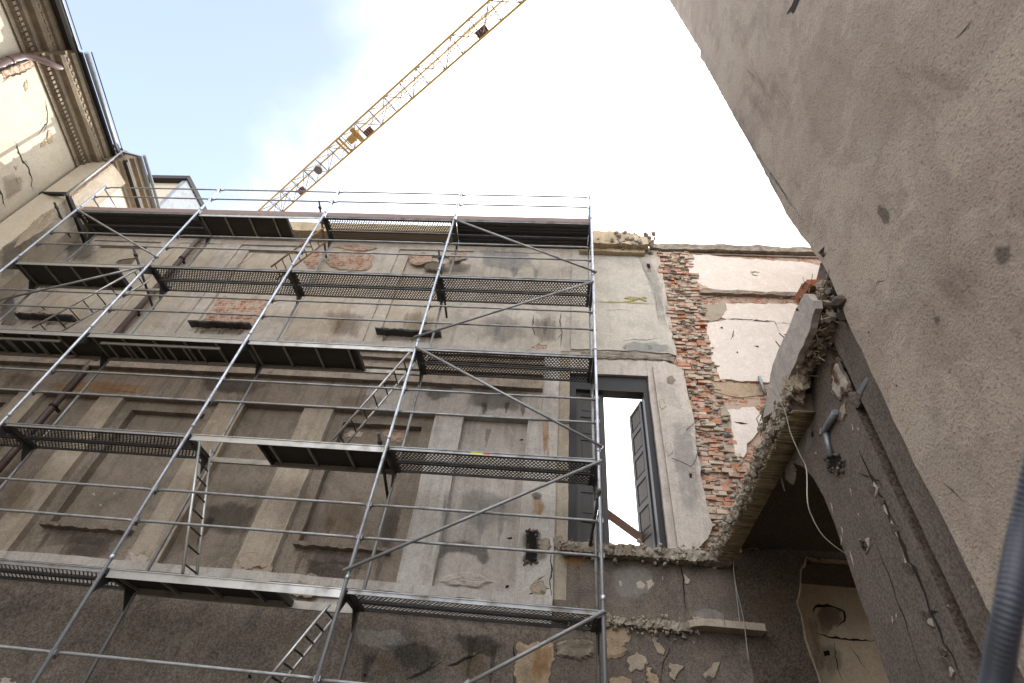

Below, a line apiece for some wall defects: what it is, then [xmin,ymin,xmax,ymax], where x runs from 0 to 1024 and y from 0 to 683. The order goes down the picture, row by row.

crack [13,100,48,189]
flaking render [303,245,376,271]
flaking render [202,295,268,327]
flaking render [691,287,727,328]
flaking render [700,337,769,466]
spalling [830,357,859,431]
peeling [530,579,550,595]
spalling [522,528,564,566]
peeling [636,577,663,590]
crack [858,449,964,682]
spalling [513,625,685,683]
crack [813,604,874,681]